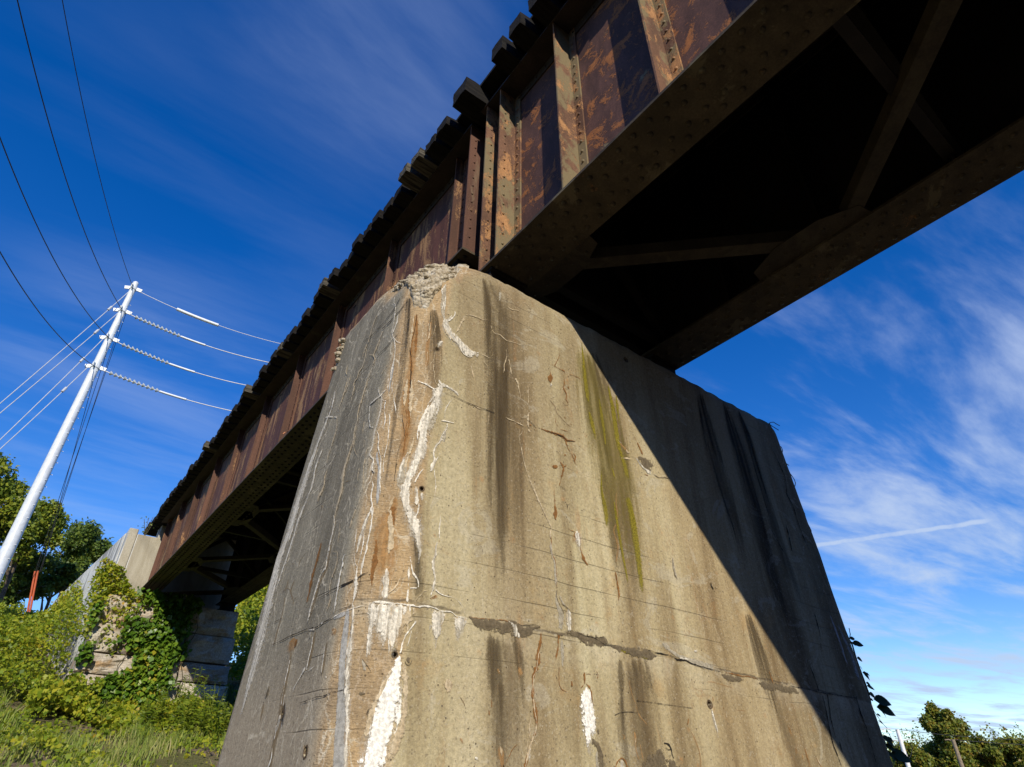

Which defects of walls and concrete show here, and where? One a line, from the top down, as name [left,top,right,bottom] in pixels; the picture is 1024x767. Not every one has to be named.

rust [410,314,430,353]
spalling [391,263,469,324]
rust [402,379,414,456]
rust [370,496,396,585]
efflorescence [333,380,467,767]
crack [272,295,618,767]
water stain [601,489,643,591]
efflorescence [580,672,599,747]